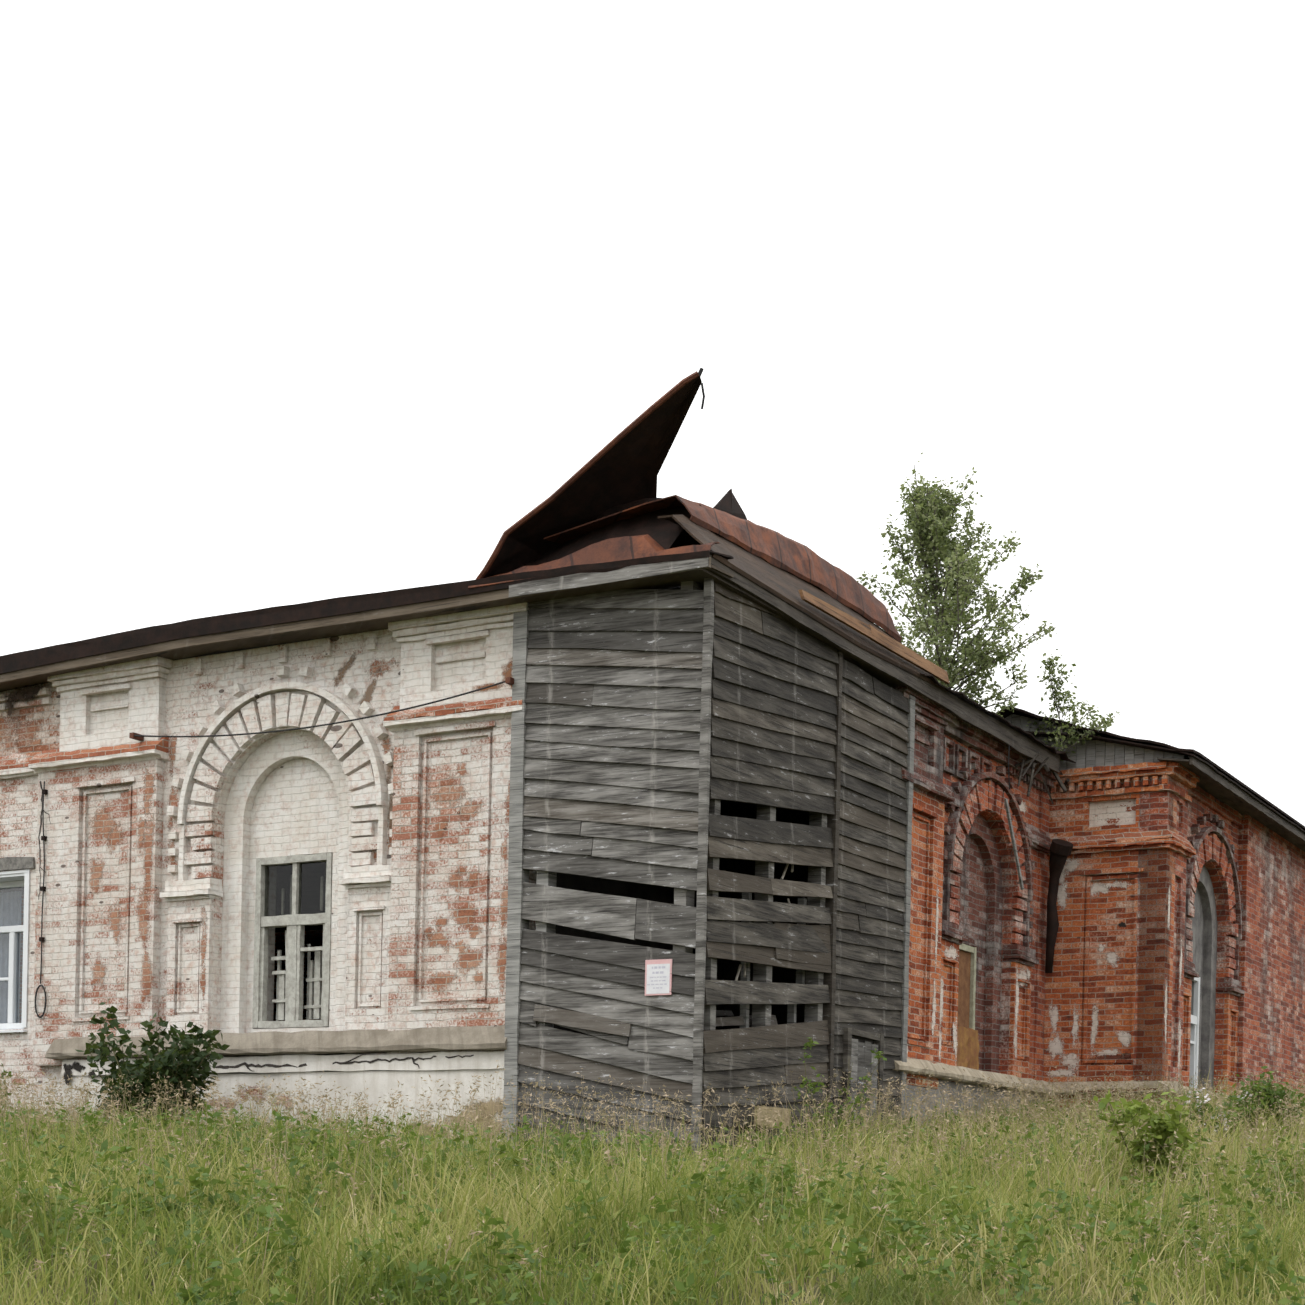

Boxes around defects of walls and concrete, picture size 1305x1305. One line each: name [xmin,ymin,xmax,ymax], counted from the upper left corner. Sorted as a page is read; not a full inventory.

peeling [0,706,44,752]
peeling [433,763,482,839]
peeling [89,737,179,1006]
peeling [424,868,508,993]